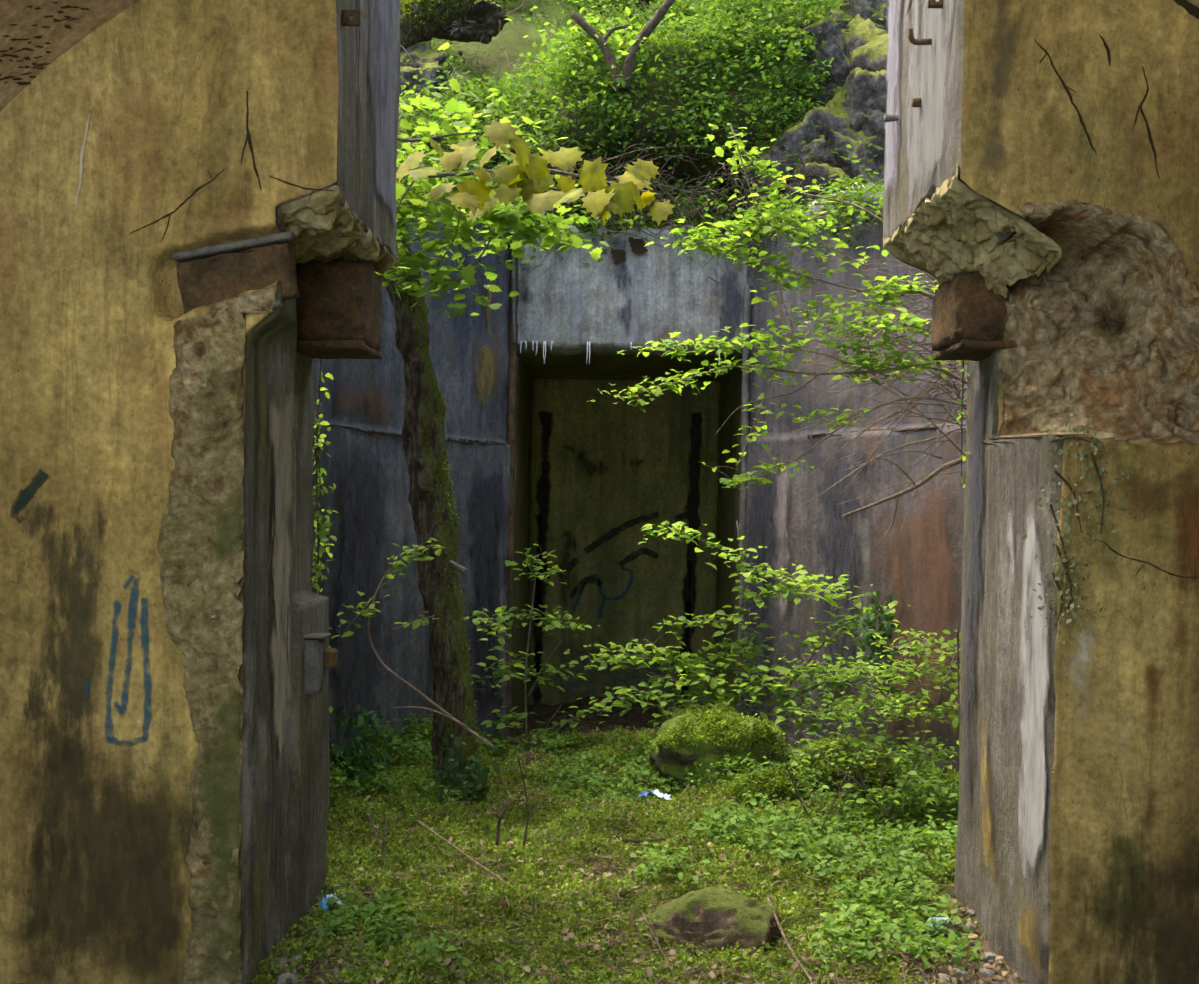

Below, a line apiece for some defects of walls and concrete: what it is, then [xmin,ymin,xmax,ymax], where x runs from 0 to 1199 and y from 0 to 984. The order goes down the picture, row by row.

crack [129,0,365,241]
crack [1034,39,1097,155]
crack [1099,35,1111,66]
crack [1132,66,1159,178]
crack [1174,0,1199,19]
spalling [883,163,1199,444]
water stain [24,507,205,982]
spalling [157,285,277,984]
water stain [532,411,702,704]
rust [879,492,957,727]
water stain [1007,515,1049,871]